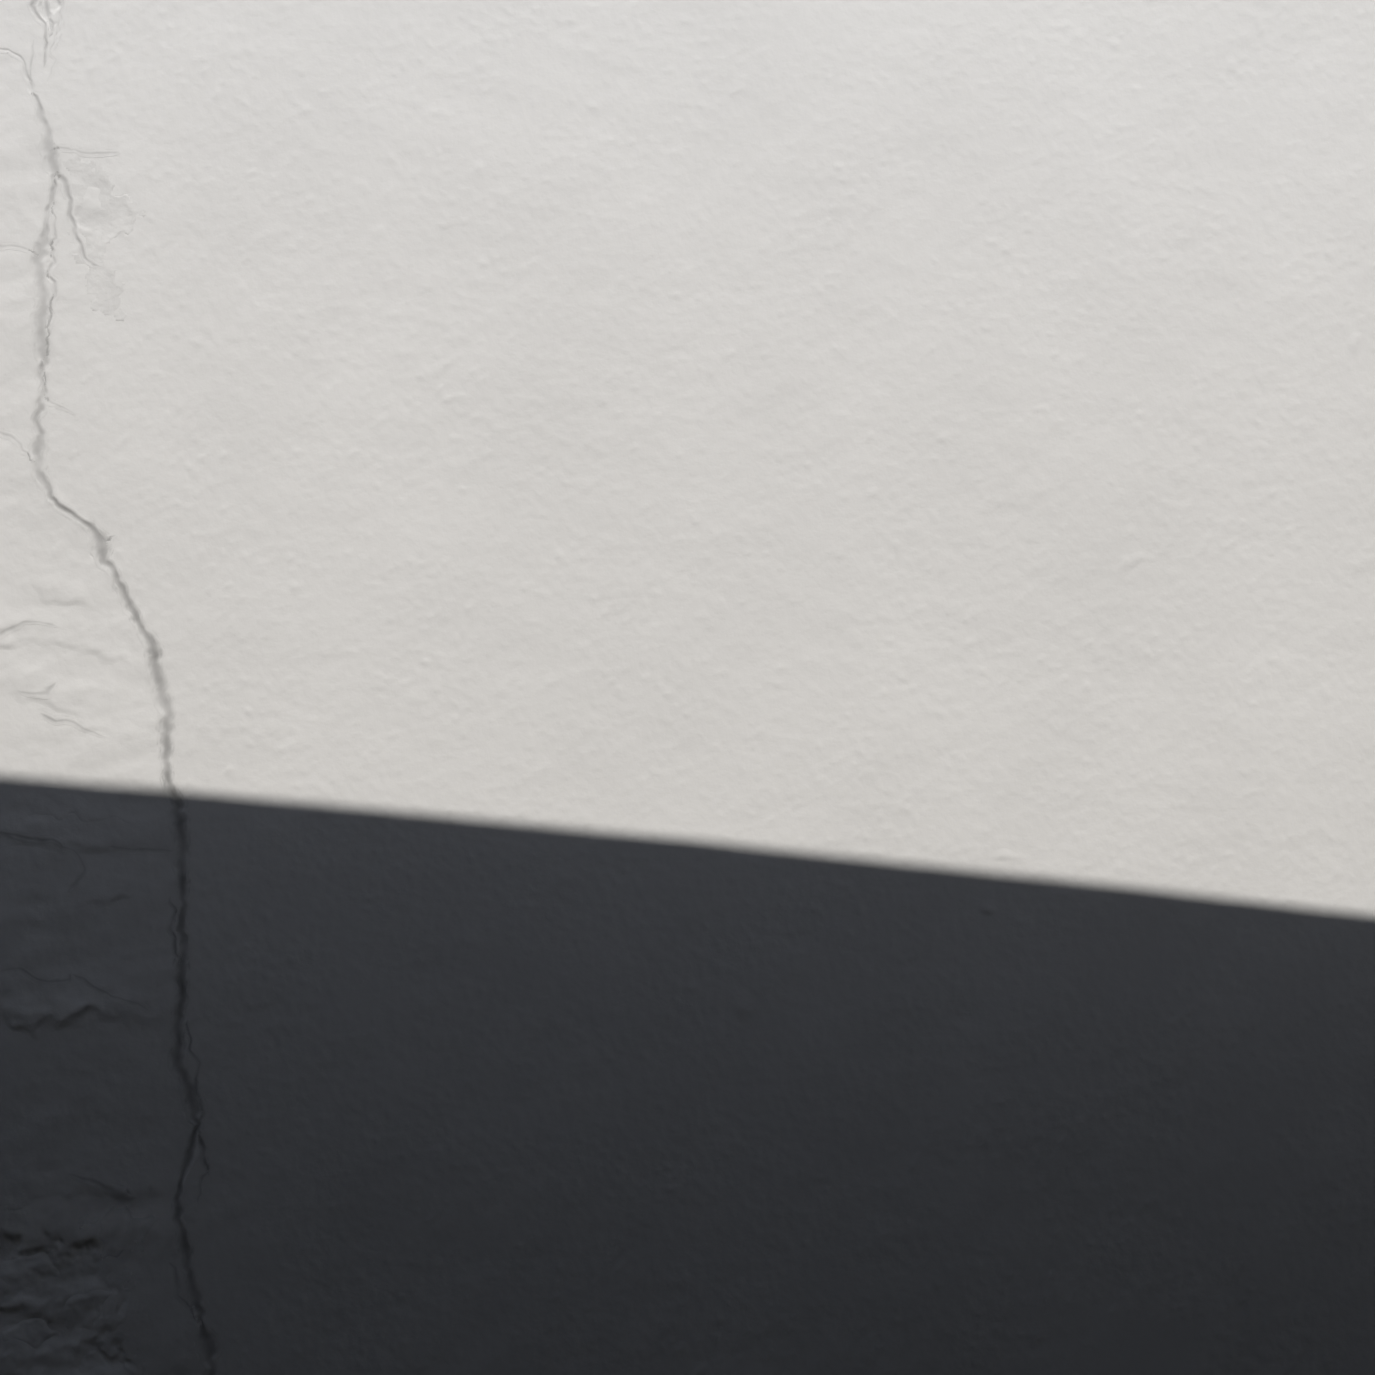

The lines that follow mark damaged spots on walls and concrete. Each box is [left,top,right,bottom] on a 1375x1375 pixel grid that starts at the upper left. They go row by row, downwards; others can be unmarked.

crack [0,0,222,1375]